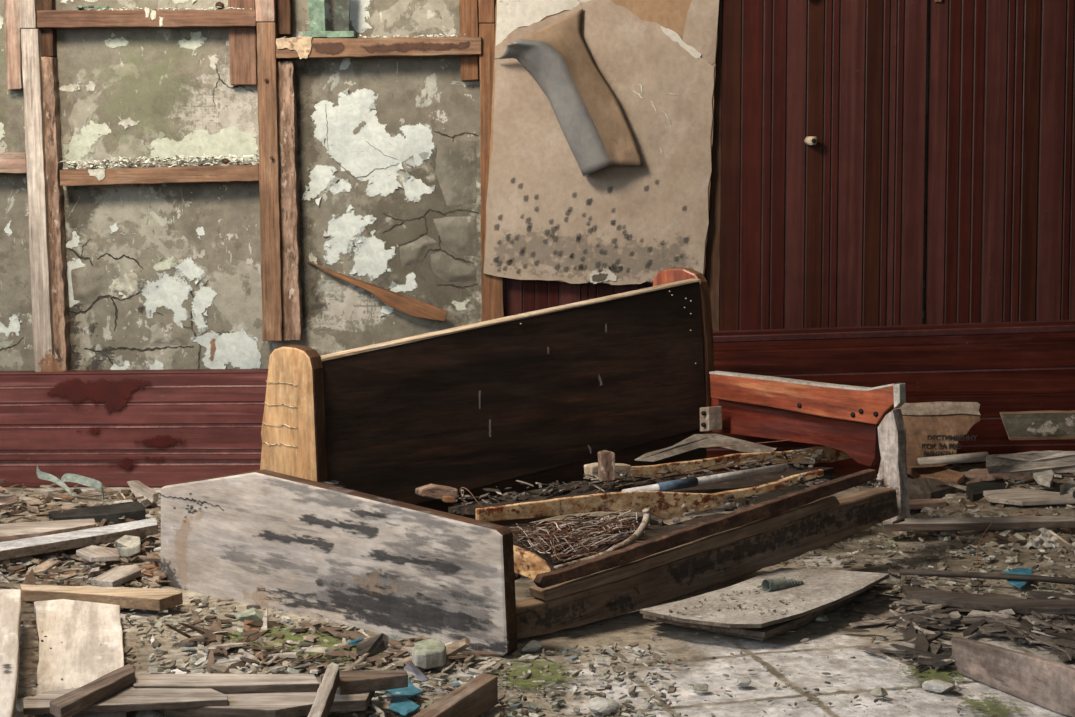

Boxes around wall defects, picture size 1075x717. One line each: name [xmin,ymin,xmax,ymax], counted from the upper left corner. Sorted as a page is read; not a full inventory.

peeling [178,31,207,56]
peeling [350,0,372,33]
peeling [59,81,96,92]
peeling [60,117,259,169]
peeling [302,88,435,293]
damp [296,41,664,331]
peeling [0,313,22,337]
peeling [66,231,86,308]
damp [47,304,151,413]
crack [68,239,232,369]
peeling [109,255,261,370]
crack [382,209,479,289]